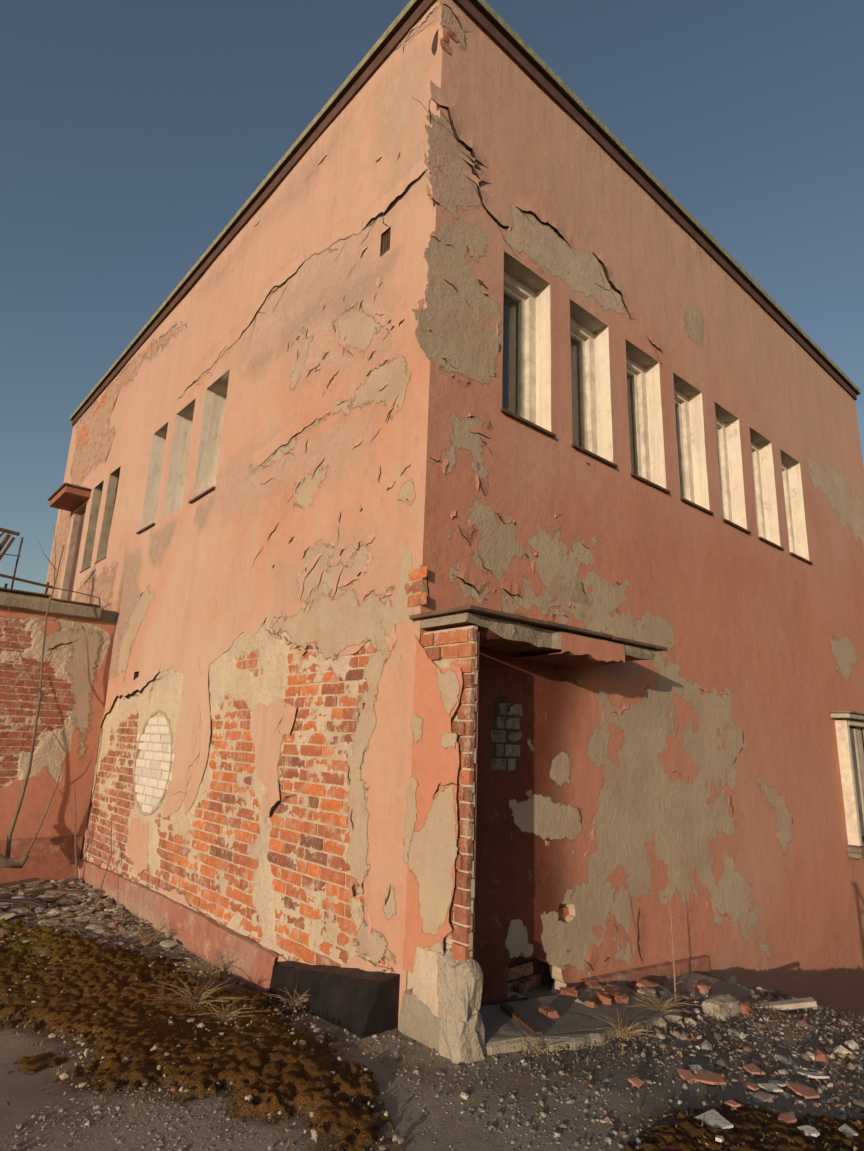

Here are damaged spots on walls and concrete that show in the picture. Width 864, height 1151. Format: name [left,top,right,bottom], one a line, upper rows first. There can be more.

peeling [242,110,502,509]
crack [177,81,666,400]
flaking render [504,204,625,314]
spalling [0,585,155,789]
crack [100,660,160,728]
spalling [86,512,429,973]
peeling [403,777,458,956]
peeling [431,412,794,993]